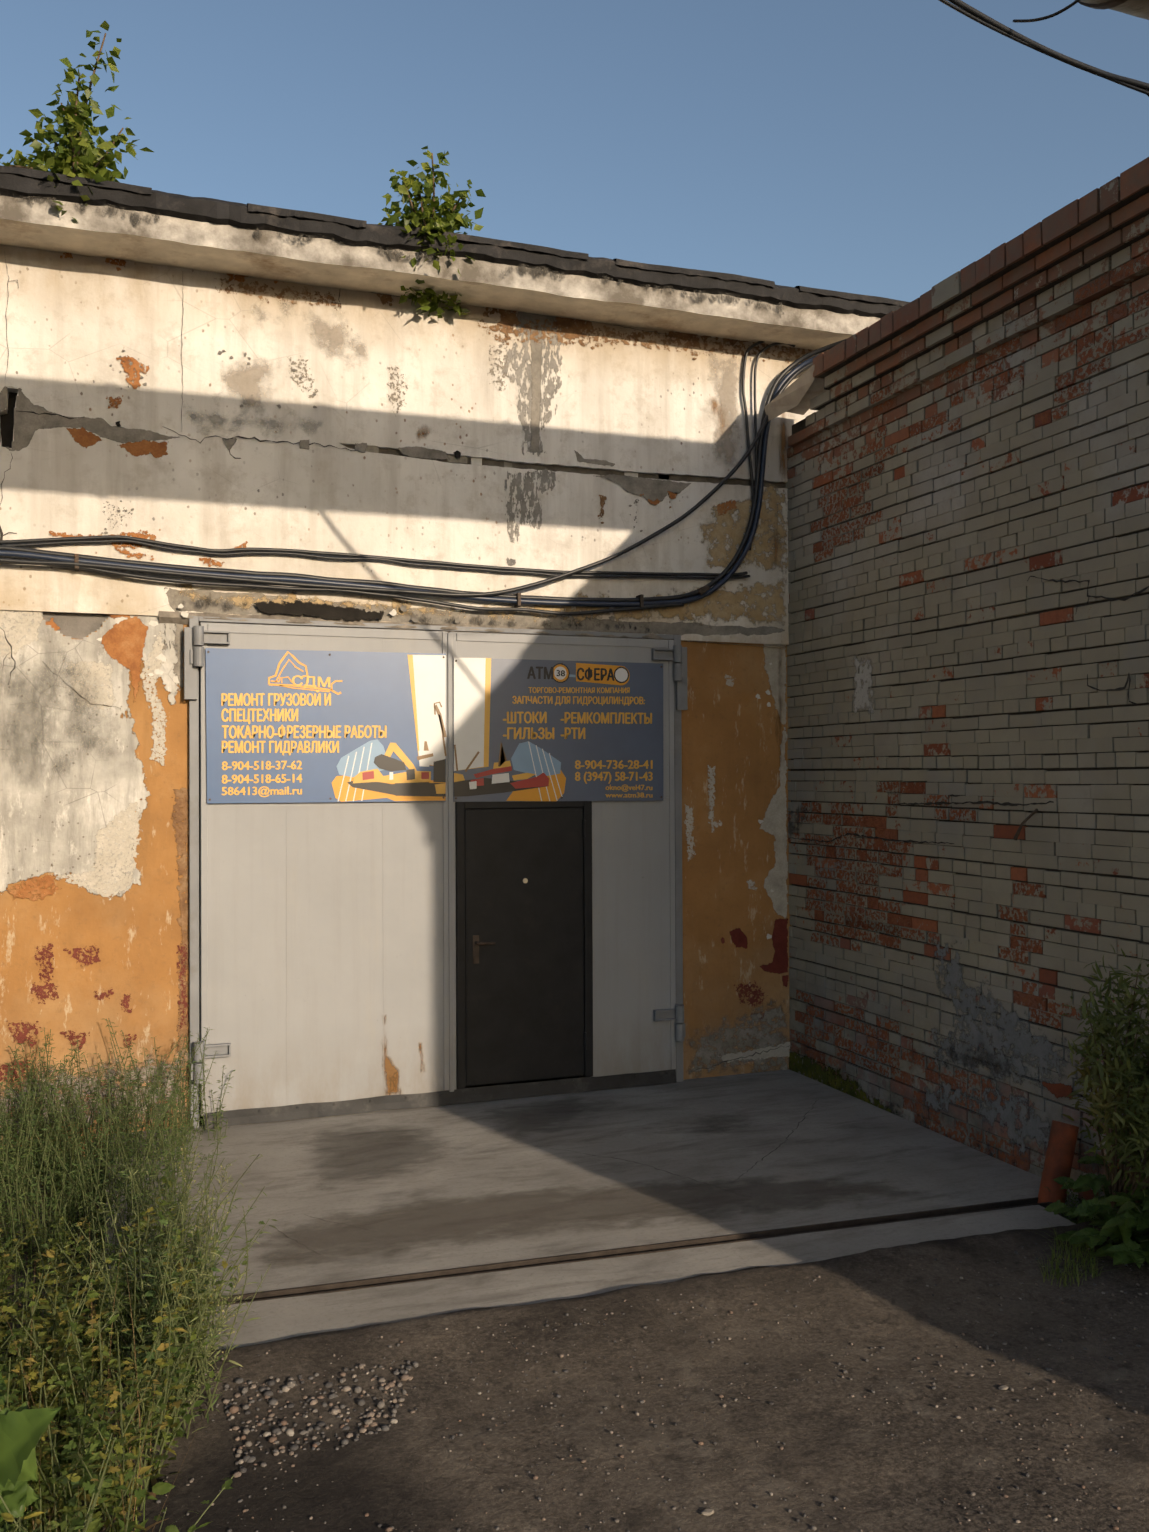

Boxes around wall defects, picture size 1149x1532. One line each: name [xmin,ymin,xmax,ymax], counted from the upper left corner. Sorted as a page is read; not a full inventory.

spalling [0,350,180,458]
peeling [49,500,160,560]
peeling [199,557,225,568]
crack [162,277,367,459]
leakage [502,311,567,566]
peeling [811,385,897,562]
peeling [1035,254,1149,427]
peeling [0,587,788,918]
spalling [172,788,189,1052]
peeling [998,882,1043,964]
corrosion [384,1046,401,1095]
peeling [877,1044,1028,1171]